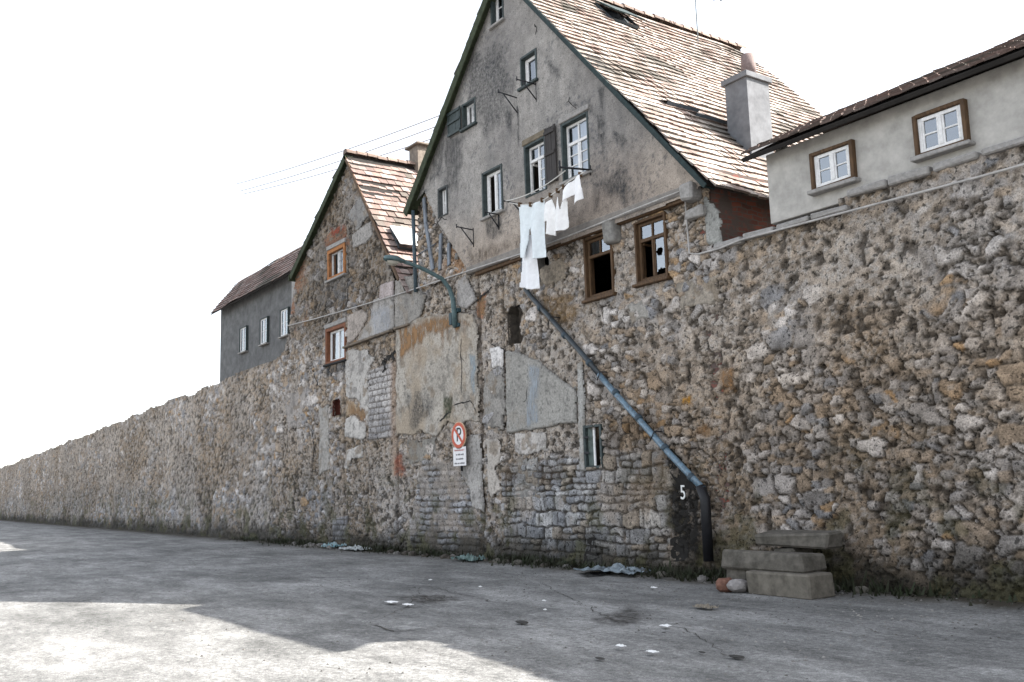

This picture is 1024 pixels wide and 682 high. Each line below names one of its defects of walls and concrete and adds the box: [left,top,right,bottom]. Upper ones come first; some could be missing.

flaking render [703,197,723,245]
flaking render [344,194,586,512]
leakage [668,457,702,552]